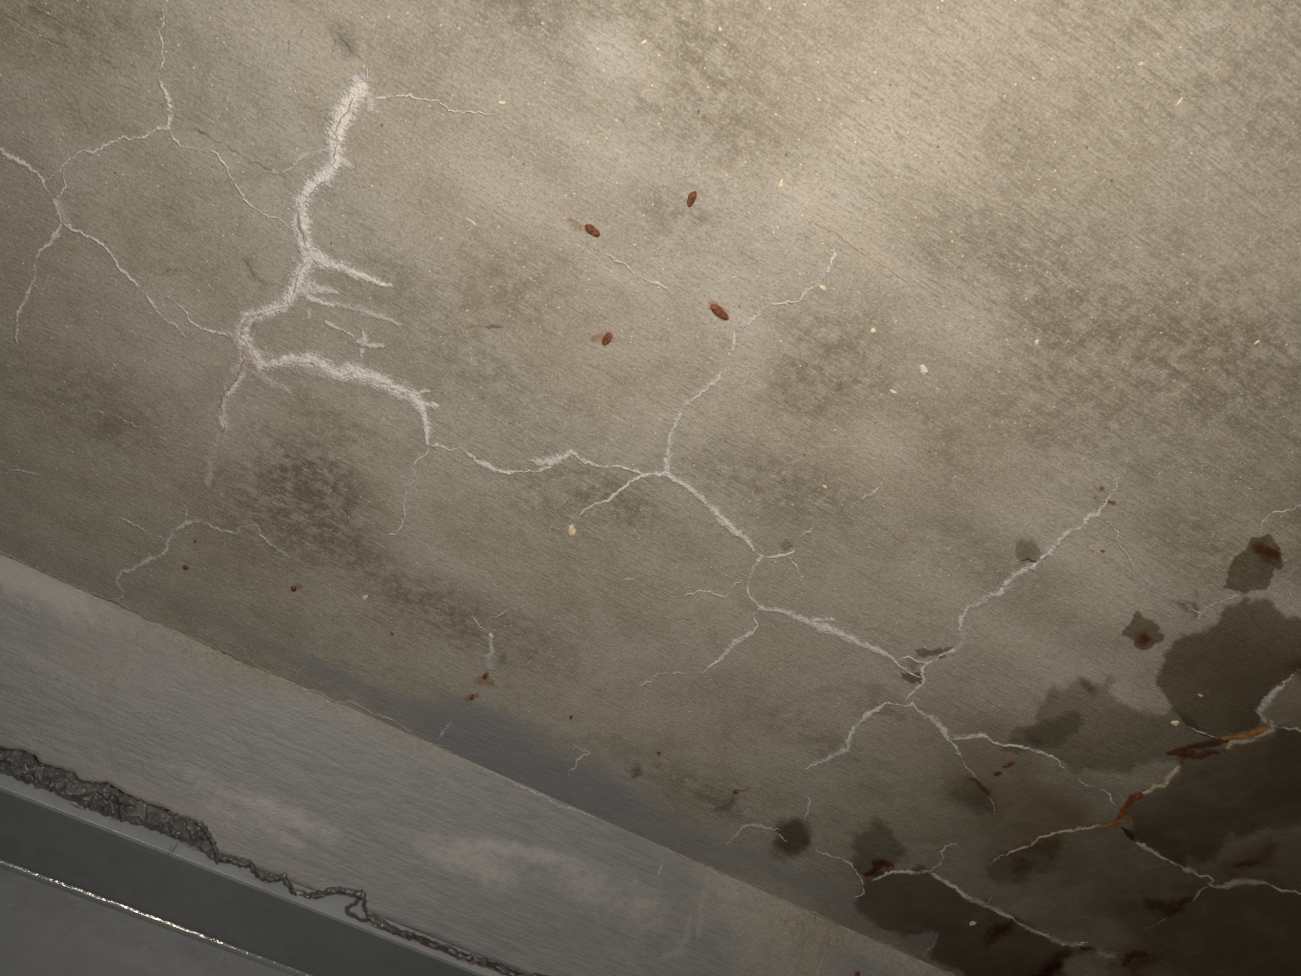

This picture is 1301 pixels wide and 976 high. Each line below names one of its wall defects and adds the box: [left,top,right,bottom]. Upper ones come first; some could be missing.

rust [687,191,697,207]
rust [585,224,600,237]
rust [710,304,729,320]
crack [0,5,1165,781]
crack [1259,504,1301,531]
crack [1189,595,1237,623]
crack [991,674,1301,922]
crack [726,794,1115,968]